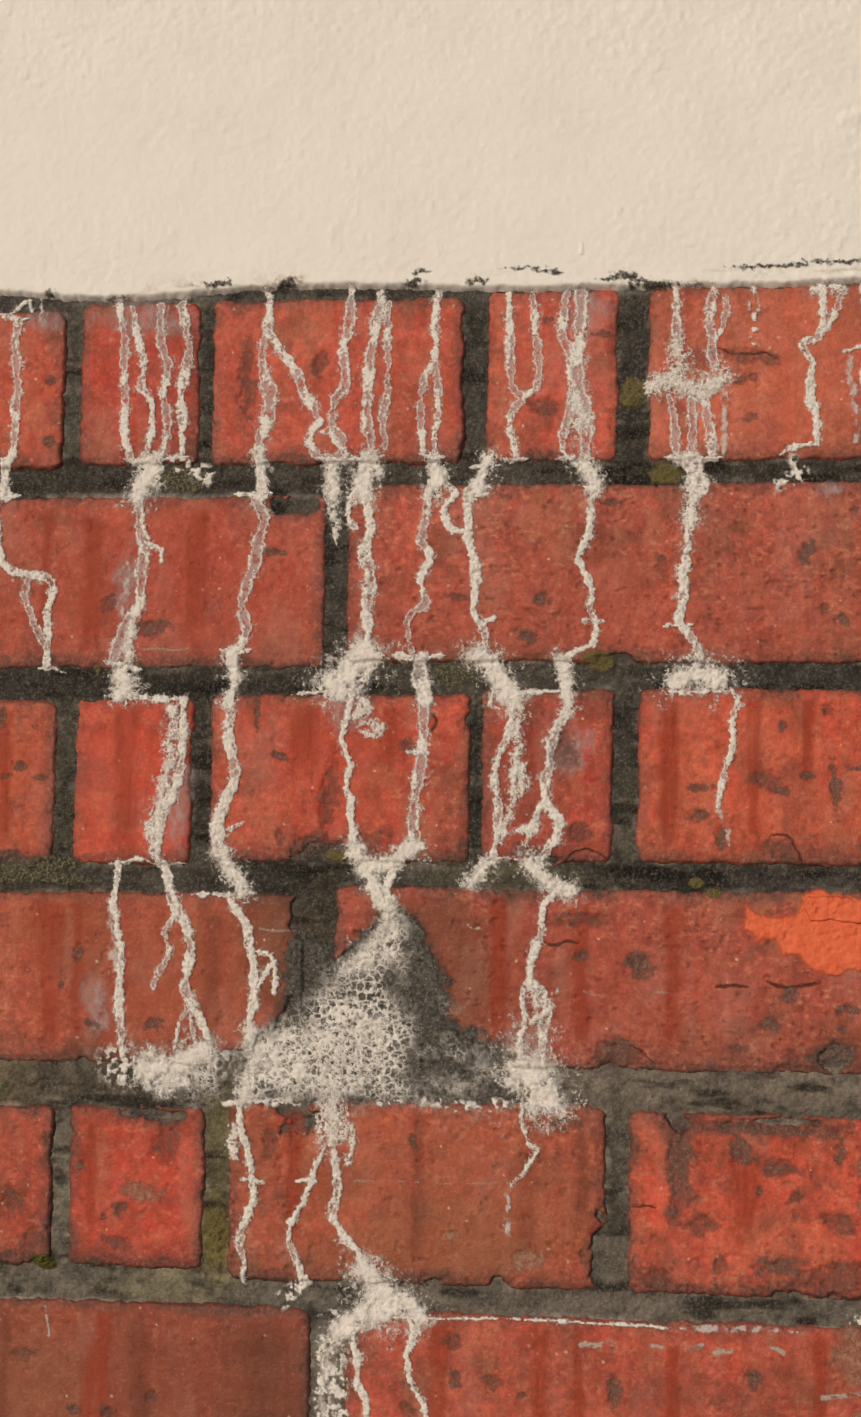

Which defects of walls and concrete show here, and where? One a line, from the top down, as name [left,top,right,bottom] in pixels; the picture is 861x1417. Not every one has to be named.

damp [0,290,54,502]
damp [405,268,428,289]
damp [733,258,861,491]
damp [0,520,62,673]
damp [601,271,747,845]
damp [98,277,717,1417]